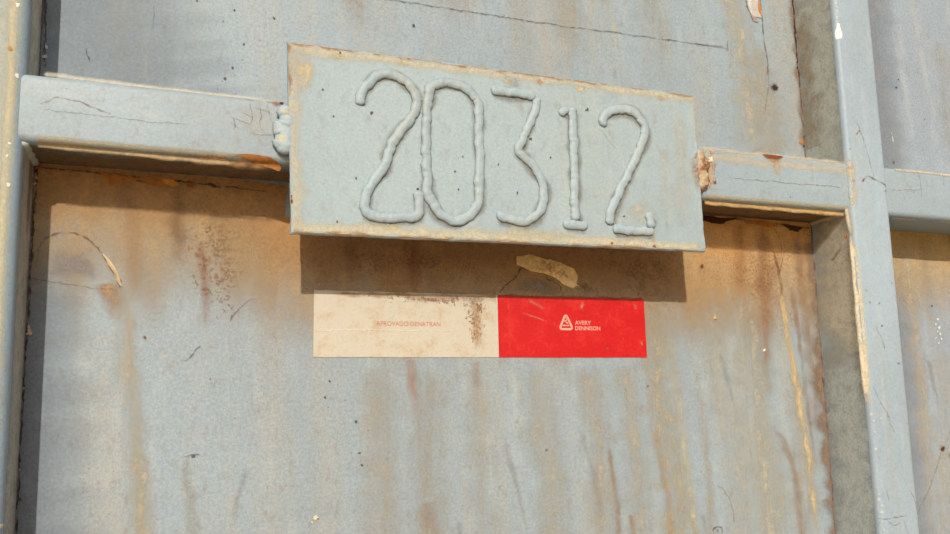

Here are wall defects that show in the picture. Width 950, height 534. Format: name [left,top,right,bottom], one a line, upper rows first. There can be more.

peeling [745,0,762,22]
corrosion [791,0,805,151]
corrosion [31,43,836,534]
spalling [499,254,579,293]